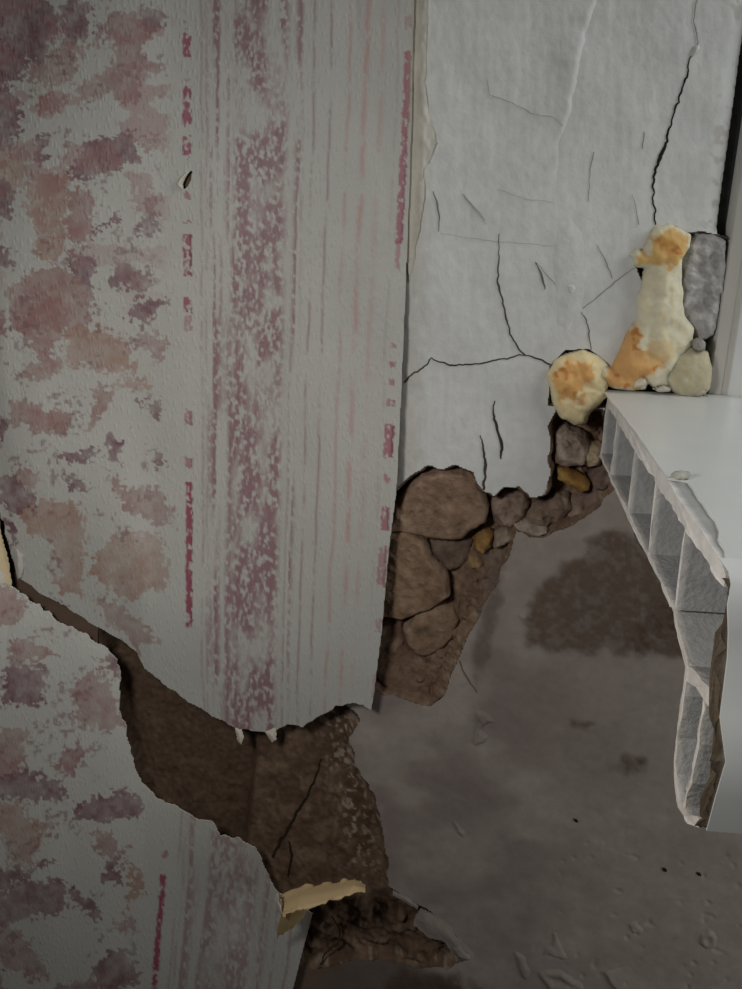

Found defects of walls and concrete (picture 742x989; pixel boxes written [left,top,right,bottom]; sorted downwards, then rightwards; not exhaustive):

crack [652,0,700,225]
crack [404,235,551,383]
crack [480,401,503,490]
spalling [375,384,674,706]
water stain [528,532,682,656]
spalling [98,627,471,969]